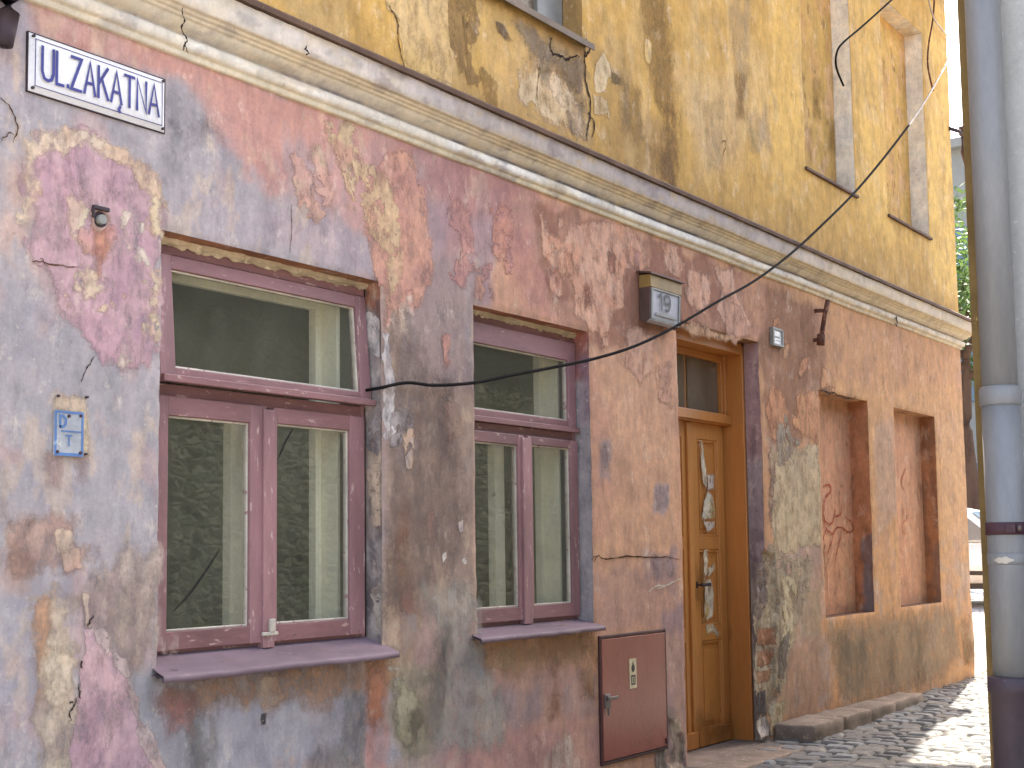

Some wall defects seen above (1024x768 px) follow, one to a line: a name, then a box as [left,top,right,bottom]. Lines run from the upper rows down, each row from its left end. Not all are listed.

crack [1,98,19,141]
crack [180,7,188,53]
crack [389,5,405,66]
crack [537,38,595,140]
spalling [516,22,620,140]
damp [641,0,679,186]
peeling [16,124,167,369]
peeling [290,120,434,527]
peeling [540,214,650,348]
flaking render [753,353,835,739]
crack [68,661,83,722]
spalling [69,593,166,768]